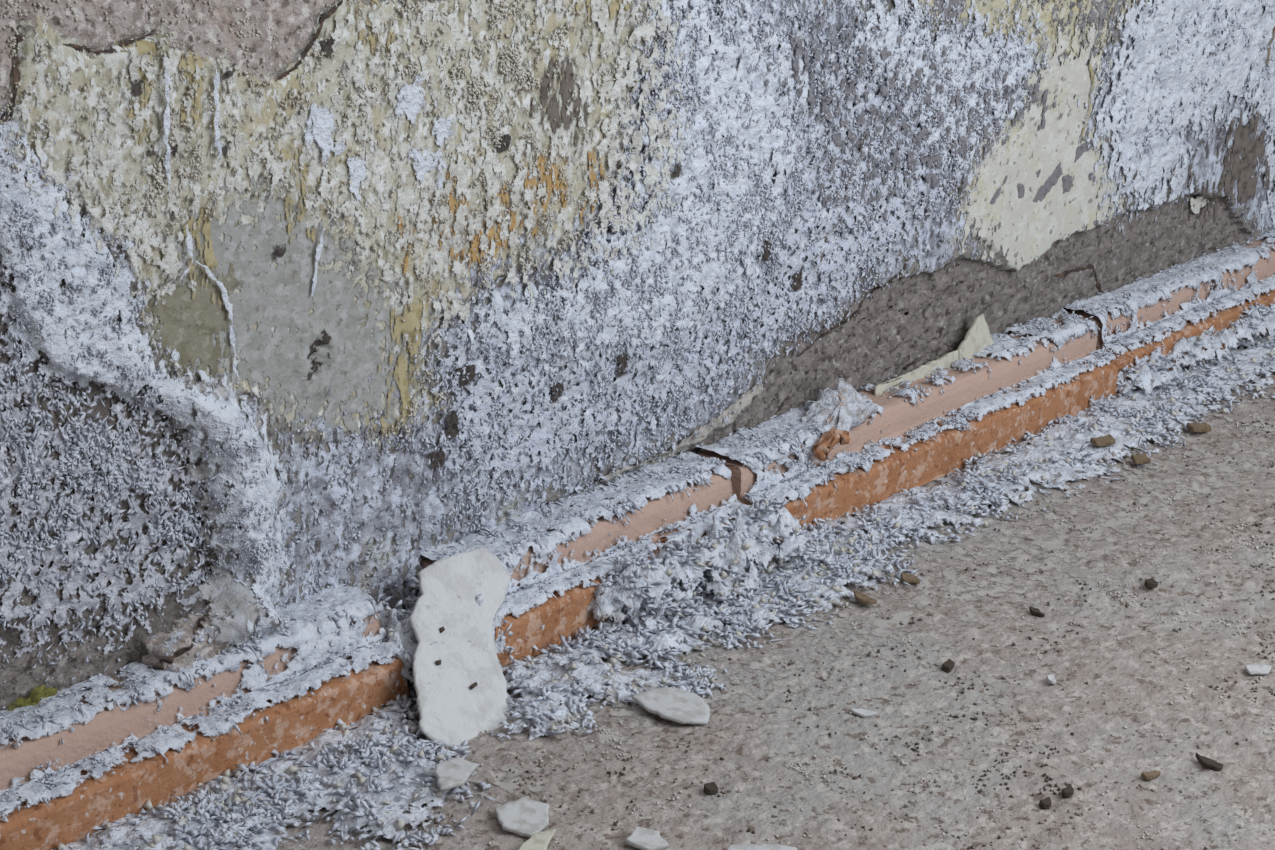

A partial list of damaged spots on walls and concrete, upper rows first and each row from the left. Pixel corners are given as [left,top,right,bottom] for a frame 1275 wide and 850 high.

peeling [878,0,1148,62]
spalling [0,312,236,710]
peeling [0,0,697,449]
peeling [409,546,511,747]
water stain [0,0,1052,822]
spalling [666,193,1251,465]
water stain [693,0,1275,509]
peeling [990,140,1093,204]
peeling [519,829,557,850]
peeling [626,826,669,850]